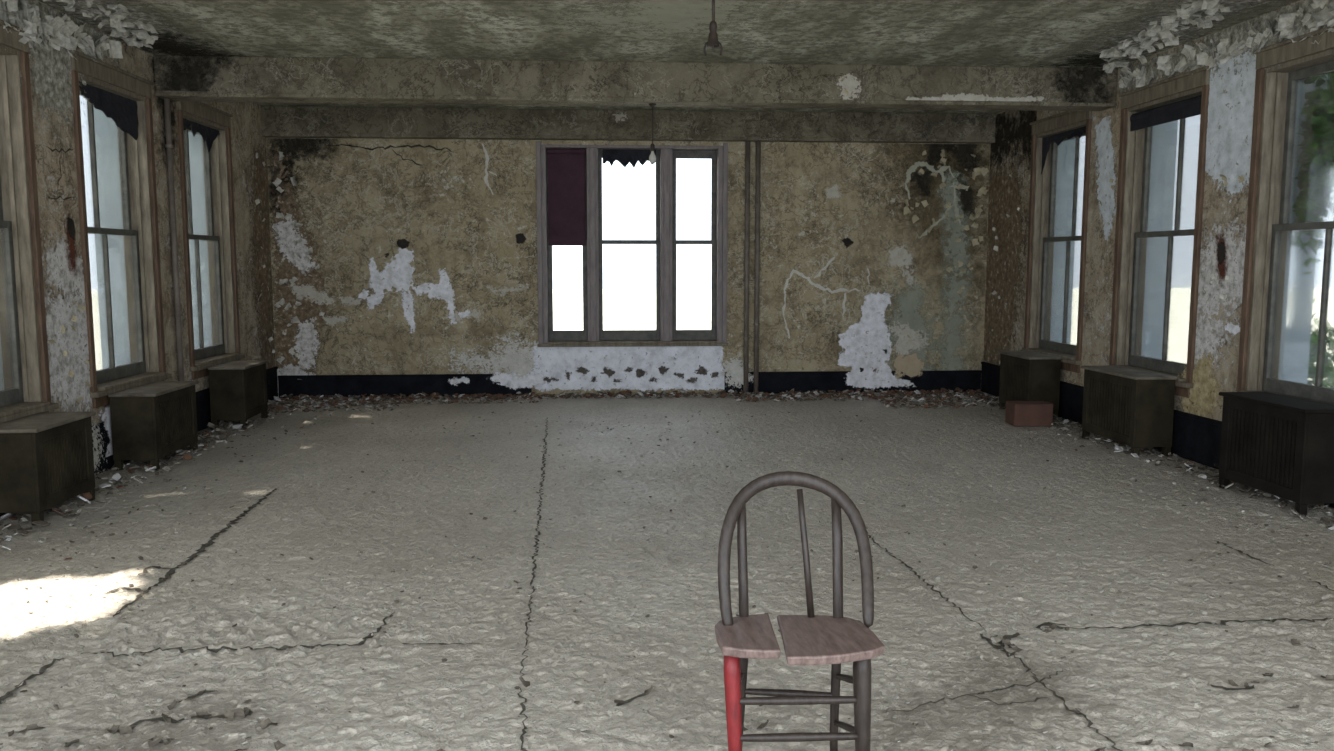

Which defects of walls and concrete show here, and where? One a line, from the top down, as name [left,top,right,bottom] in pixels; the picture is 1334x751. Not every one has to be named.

corrosion [65,217,77,271]
flaking render [255,177,754,397]
peeling [837,243,931,390]
leakage [885,110,1037,371]
peeling [1065,0,1334,370]
crack [105,488,277,617]
crack [886,670,1063,713]
crack [1038,617,1331,630]